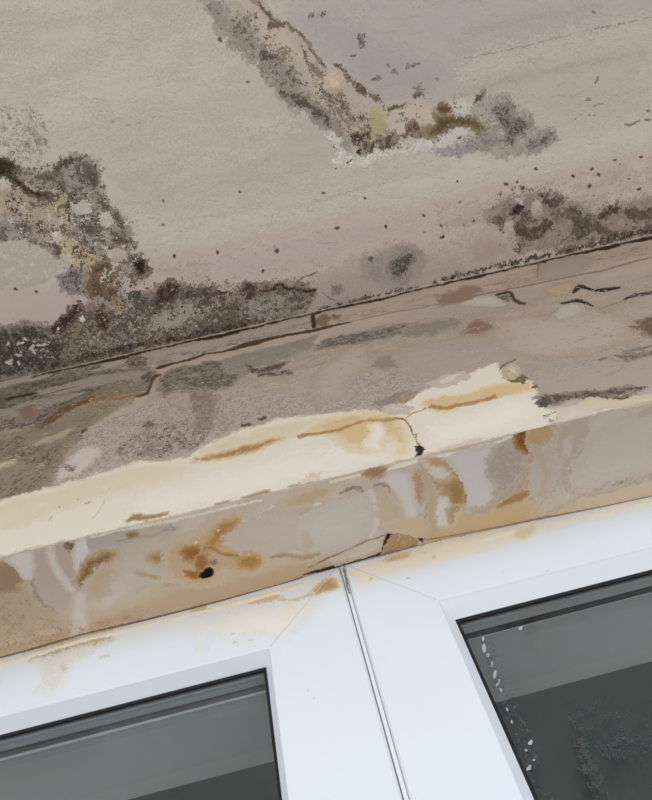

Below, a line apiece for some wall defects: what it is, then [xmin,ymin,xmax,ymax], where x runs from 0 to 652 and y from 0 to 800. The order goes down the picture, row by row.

water stain [195,0,652,171]
crack [4,236,652,401]
peeling [0,410,360,557]
rust [177,516,265,580]
rust [188,434,286,464]
water stain [0,103,652,696]
crack [0,495,652,658]
rust [297,416,402,439]
peeling [327,533,418,567]
crack [397,407,427,444]
rust [411,455,468,527]
peeling [321,362,566,483]